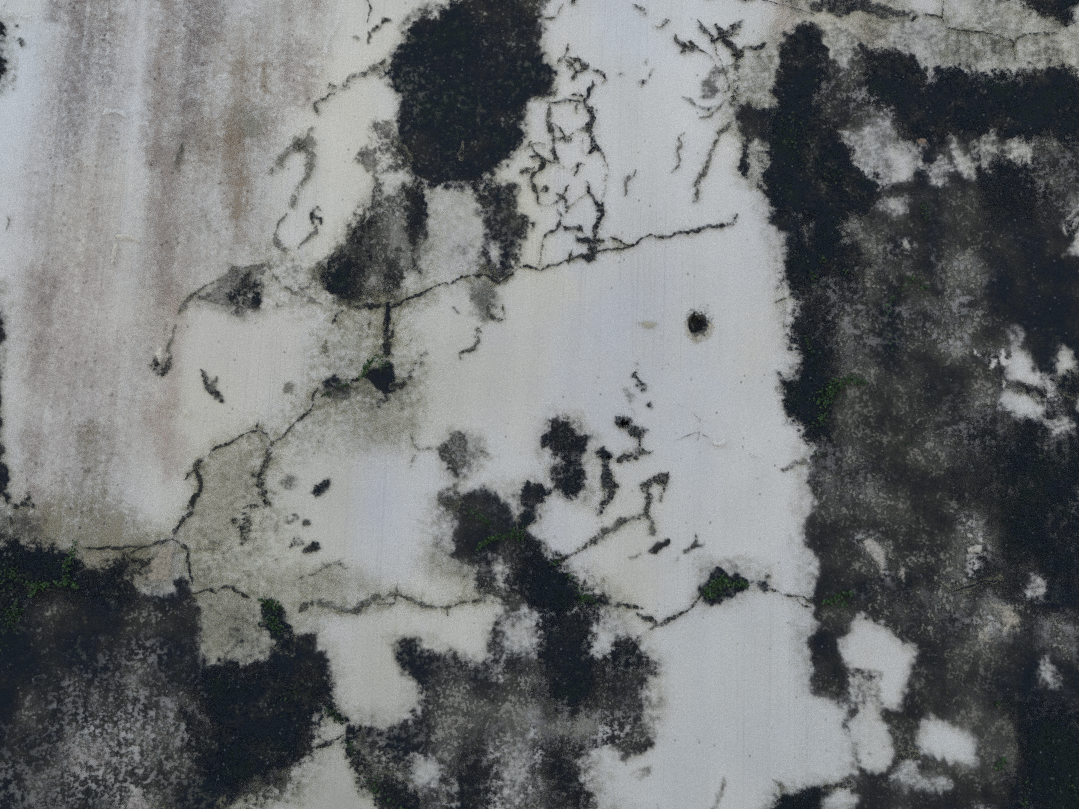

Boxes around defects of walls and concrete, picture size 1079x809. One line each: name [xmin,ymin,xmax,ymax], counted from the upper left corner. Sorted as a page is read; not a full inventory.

water stain [146,29,196,294]
water stain [196,0,558,433]
crack [166,0,815,360]
water stain [150,352,172,377]
crack [83,388,318,598]
water stain [0,369,662,809]
crack [298,565,497,616]
crack [578,416,669,552]
water stain [629,538,670,558]
crack [623,594,702,630]
crack [771,588,812,608]
water stain [683,0,1079,809]